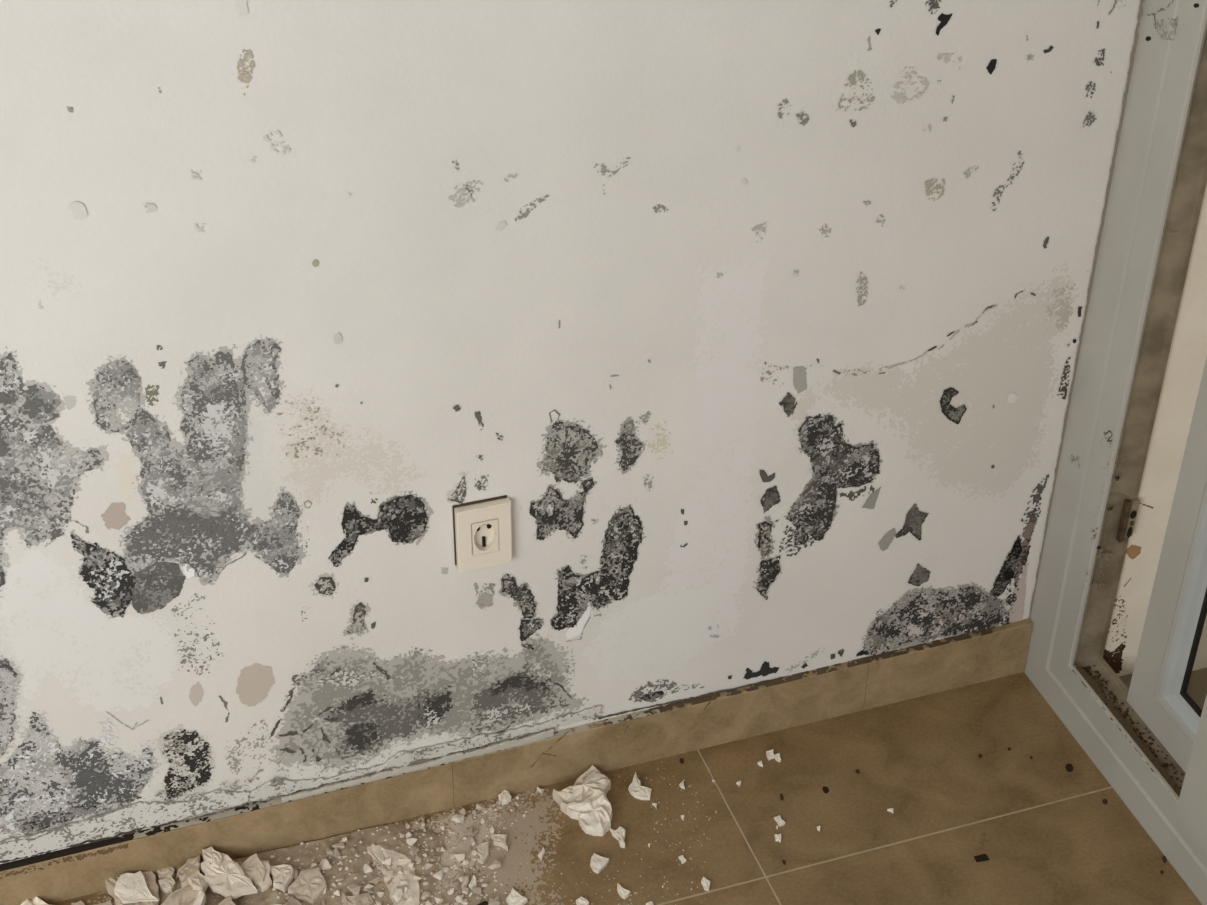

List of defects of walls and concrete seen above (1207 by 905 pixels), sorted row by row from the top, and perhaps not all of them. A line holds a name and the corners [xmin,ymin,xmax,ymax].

damp [0,335,434,707]
damp [0,409,673,836]
damp [728,263,1089,679]